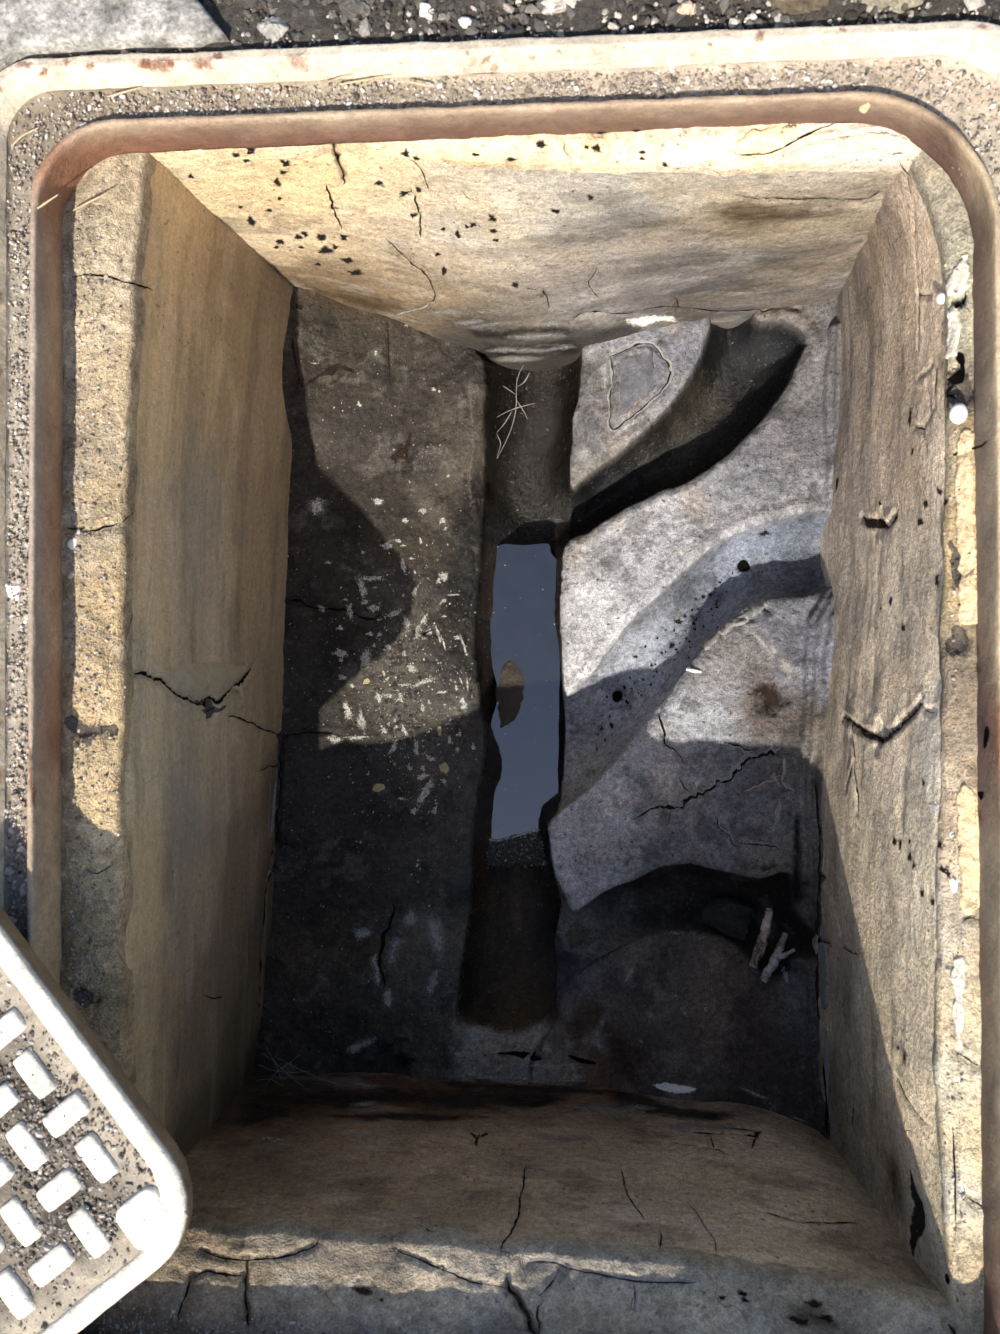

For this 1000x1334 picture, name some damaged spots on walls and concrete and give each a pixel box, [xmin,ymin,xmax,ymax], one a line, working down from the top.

crack [134,669,338,1043]
crack [630,704,934,1019]
crack [375,903,395,987]
crack [822,1064,854,1131]
crack [175,1237,320,1326]
crack [391,1168,695,1334]
crack [757,1210,854,1223]